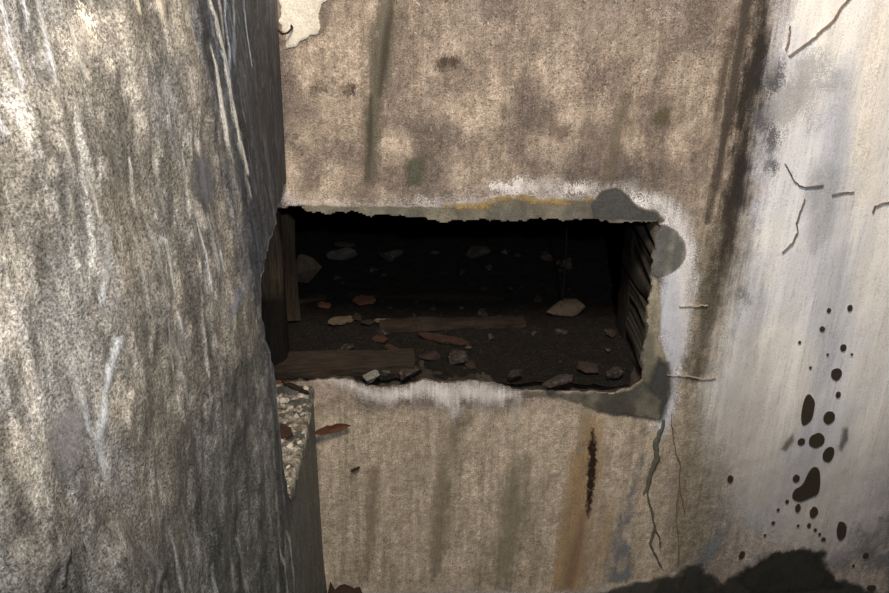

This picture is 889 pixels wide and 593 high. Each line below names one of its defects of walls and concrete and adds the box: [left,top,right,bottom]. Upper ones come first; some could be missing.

peeling [279,0,327,48]
water stain [366,0,394,183]
water stain [435,54,458,71]
crack [785,0,849,57]
water stain [488,175,551,199]
crack [782,164,854,253]
spalling [297,188,686,421]
water stain [328,189,699,434]
water stain [556,0,889,593]
corrosion [555,413,603,593]
crack [643,414,685,568]